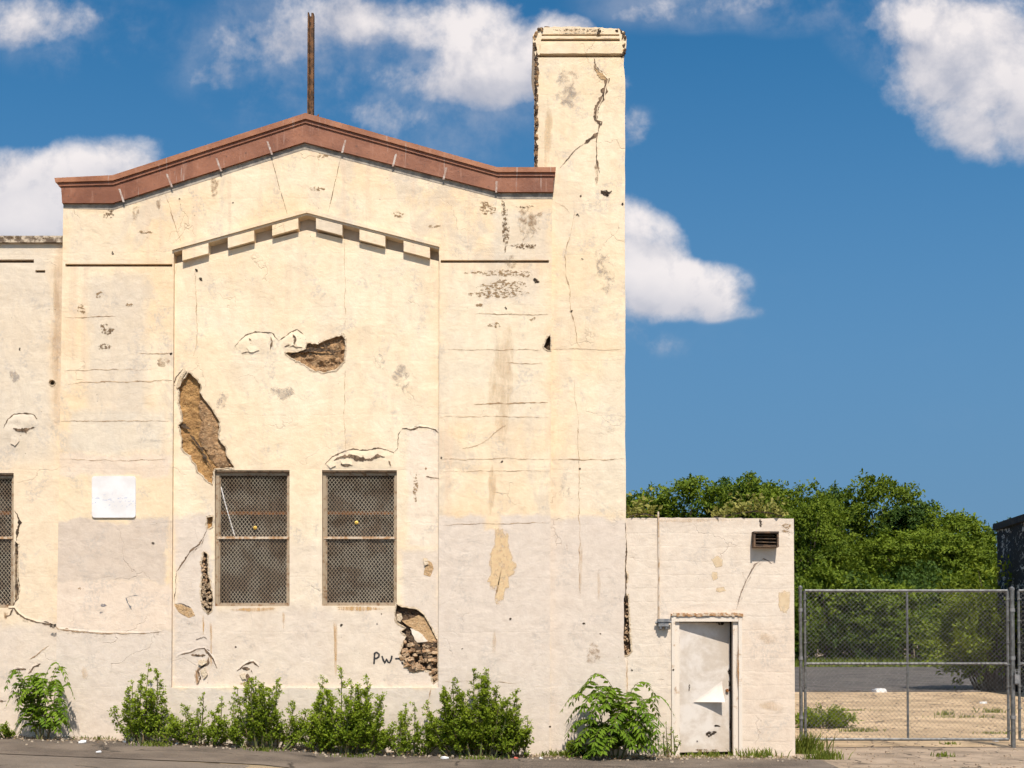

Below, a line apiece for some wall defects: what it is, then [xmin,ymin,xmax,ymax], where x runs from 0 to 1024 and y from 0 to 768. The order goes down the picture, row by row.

spalling [532,26,549,167]
crack [560,58,610,173]
peeling [465,269,530,309]
spalling [284,333,347,374]
spalling [174,369,235,486]
crack [5,606,162,674]
spalling [174,551,214,618]
spalling [377,602,439,684]
spalling [623,571,633,657]
crack [737,559,772,609]